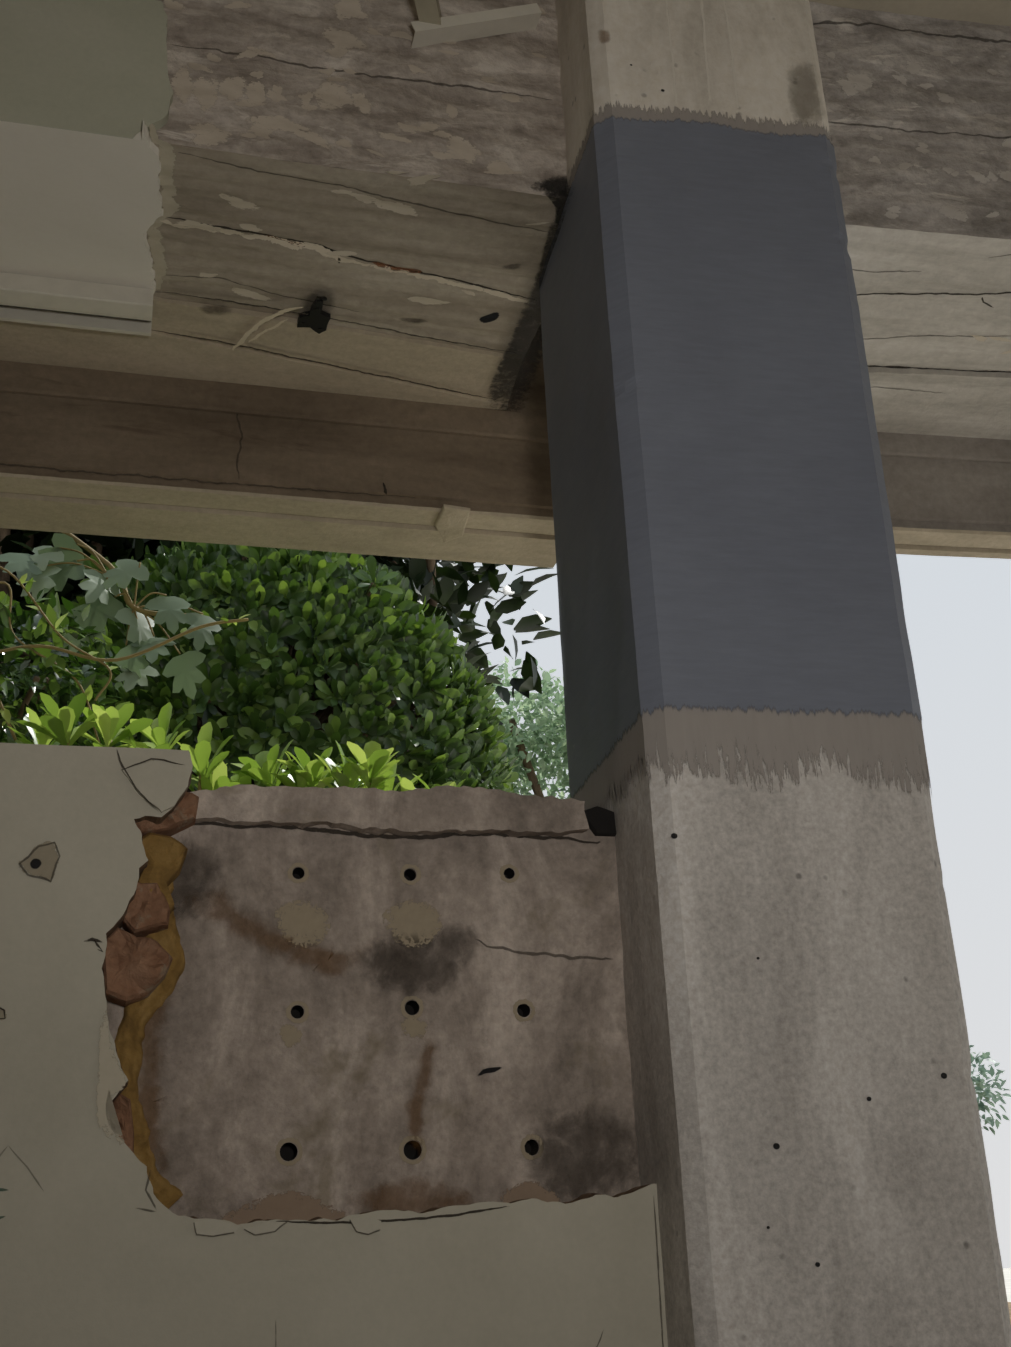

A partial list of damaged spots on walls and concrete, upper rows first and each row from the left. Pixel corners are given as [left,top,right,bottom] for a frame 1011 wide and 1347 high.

crack [813,21,1011,43]
crack [852,269,1011,393]
crack [195,821,600,844]
leakage [275,900,331,948]
leakage [382,899,443,947]
crack [478,940,610,960]
spalling [103,750,640,1237]